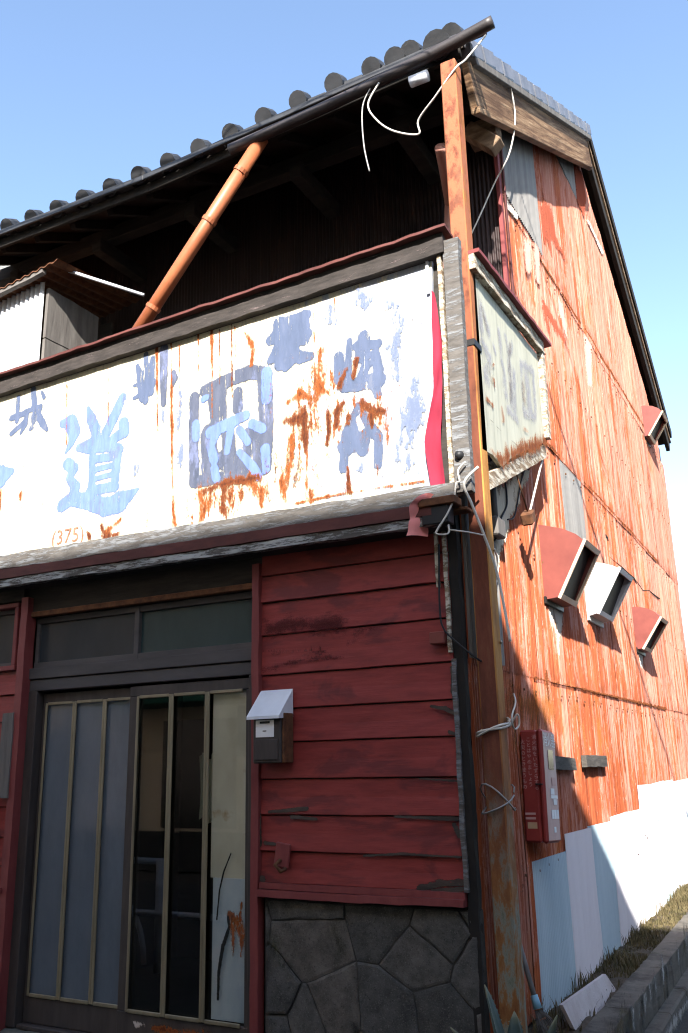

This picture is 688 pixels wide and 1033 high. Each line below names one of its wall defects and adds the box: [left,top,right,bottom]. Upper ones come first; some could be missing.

peeling [322,287,373,330]
rust [155,313,425,527]
peeling [385,300,426,486]
rust [492,428,560,477]
rust [584,482,658,563]